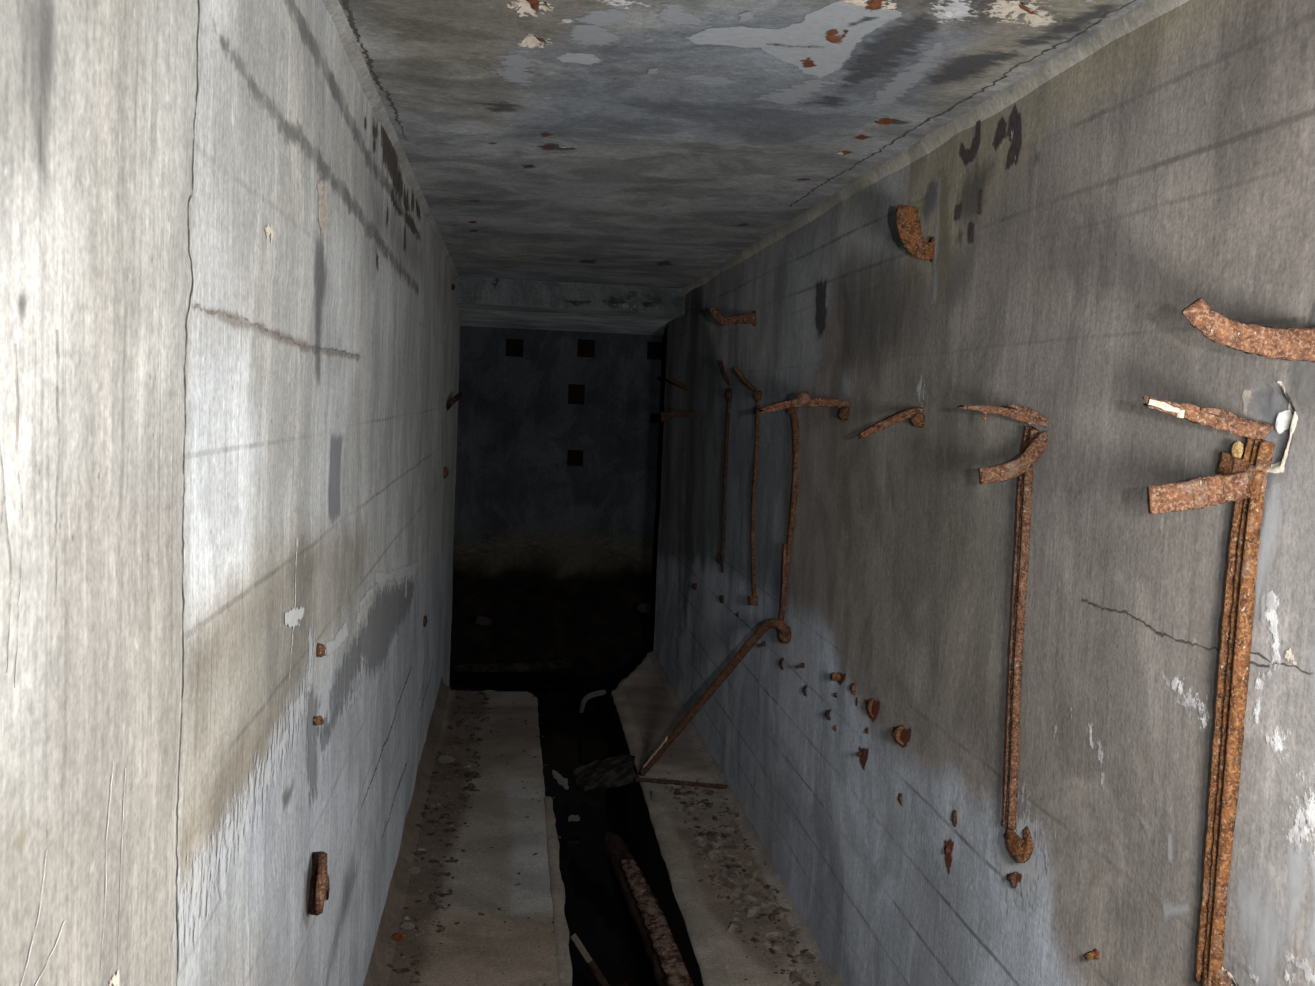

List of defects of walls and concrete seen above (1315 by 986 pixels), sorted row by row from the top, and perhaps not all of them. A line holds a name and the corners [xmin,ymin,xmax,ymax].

leakage [289,0,316,56]
peeling [507,0,903,107]
spalling [926,0,1070,31]
leakage [318,74,421,295]
leakage [326,561,418,663]
crack [1082,598,1315,675]
leakage [1253,482,1297,756]
rust [859,746,869,770]
rust [865,700,880,722]
rust [893,727,912,748]
rust [944,839,954,874]
leakage [1241,764,1315,985]